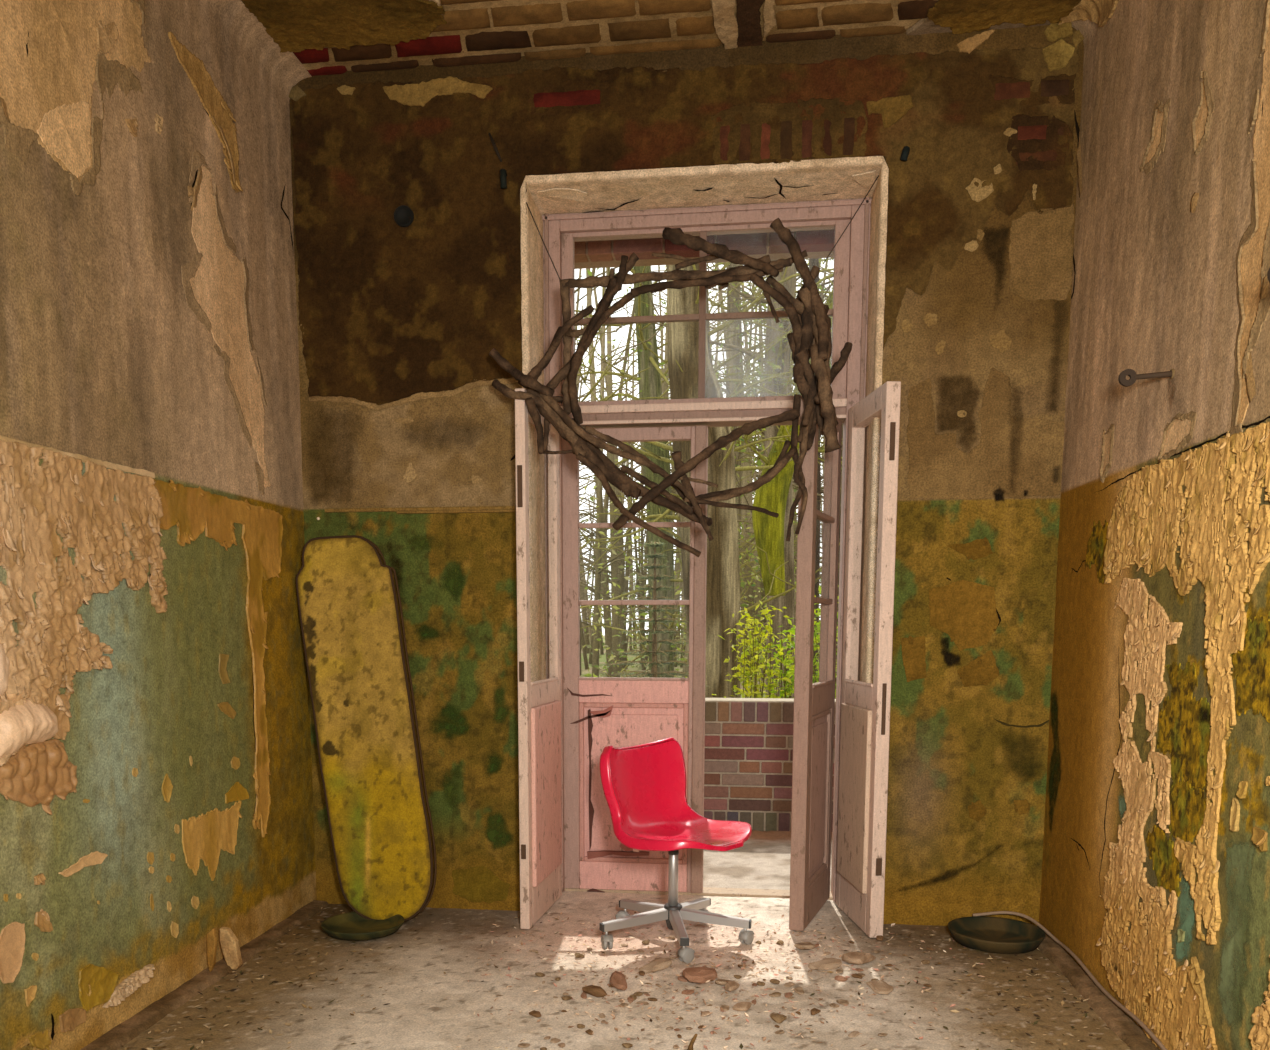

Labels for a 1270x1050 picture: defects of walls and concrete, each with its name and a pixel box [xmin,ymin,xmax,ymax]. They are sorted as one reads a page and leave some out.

peeling [0,0,152,195]
spalling [241,0,1084,423]
peeling [0,32,283,885]
peeling [1085,0,1270,1050]
leakage [941,638,960,666]
peeling [0,909,53,1007]
peeling [78,964,155,1011]
peeling [150,894,179,938]
leakage [918,864,976,886]